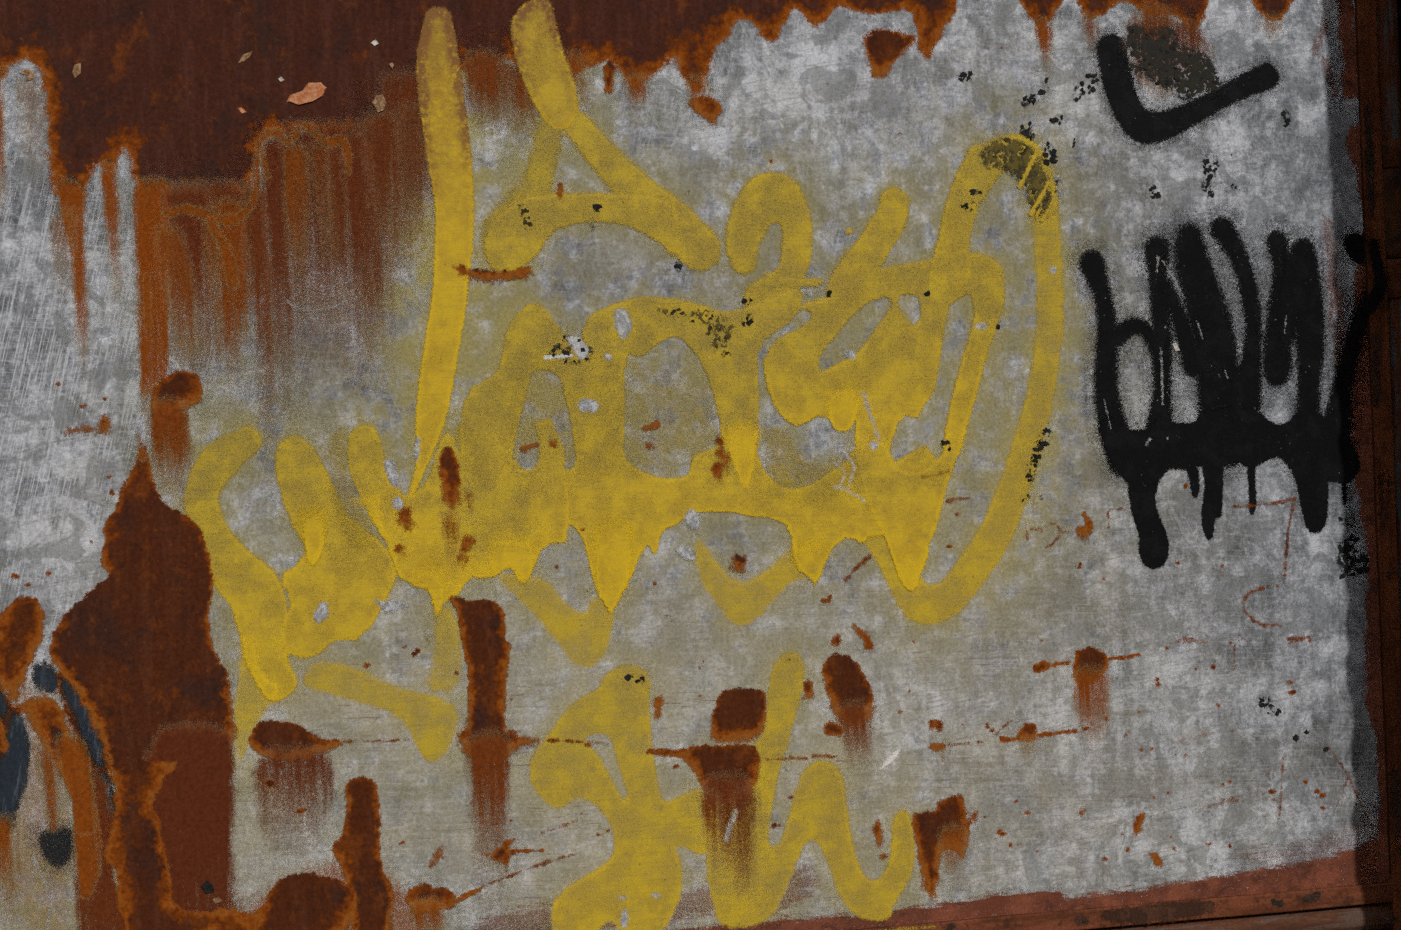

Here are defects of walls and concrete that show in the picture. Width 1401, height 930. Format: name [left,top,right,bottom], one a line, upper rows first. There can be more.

rust [1019,0,1221,102]
rust [1248,0,1295,40]
rust [0,0,963,930]
rust [986,646,1142,764]
rust [910,793,994,904]